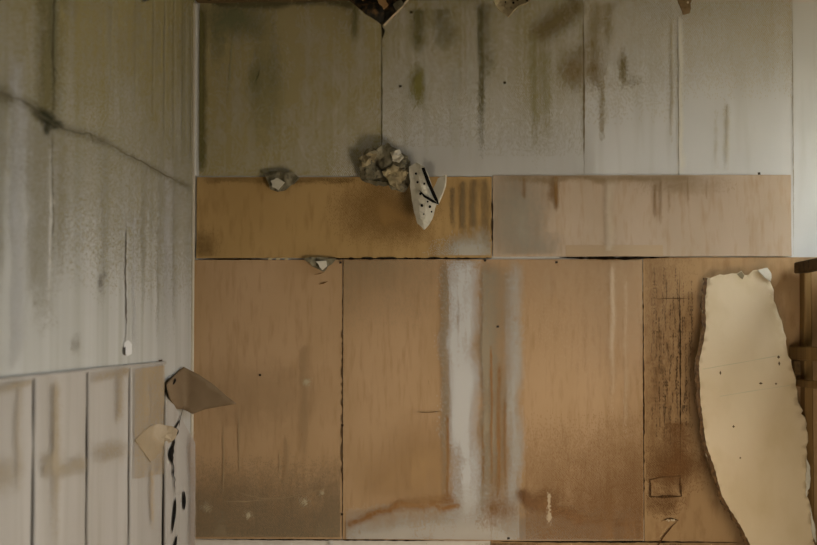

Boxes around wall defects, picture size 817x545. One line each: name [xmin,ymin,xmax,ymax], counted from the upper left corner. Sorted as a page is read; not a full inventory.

crack [0,0,191,250]
leakage [41,365,165,543]
leakage [0,0,221,368]
peeling [166,367,236,414]
leakage [186,0,792,545]